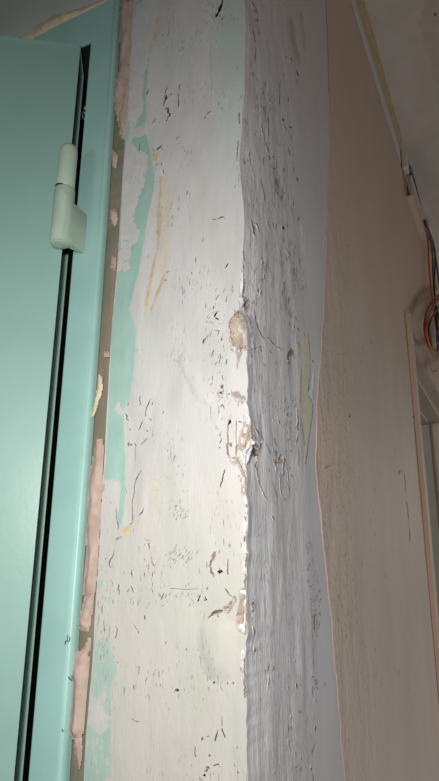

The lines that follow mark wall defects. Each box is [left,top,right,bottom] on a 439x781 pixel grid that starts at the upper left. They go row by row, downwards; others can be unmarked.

peeling [19,0,108,39]
crack [214,0,224,22]
crack [244,57,299,213]
spalling [205,249,264,365]
peeling [295,325,315,464]
spalling [208,376,269,635]
peeling [84,554,121,781]
spalling [213,645,256,698]